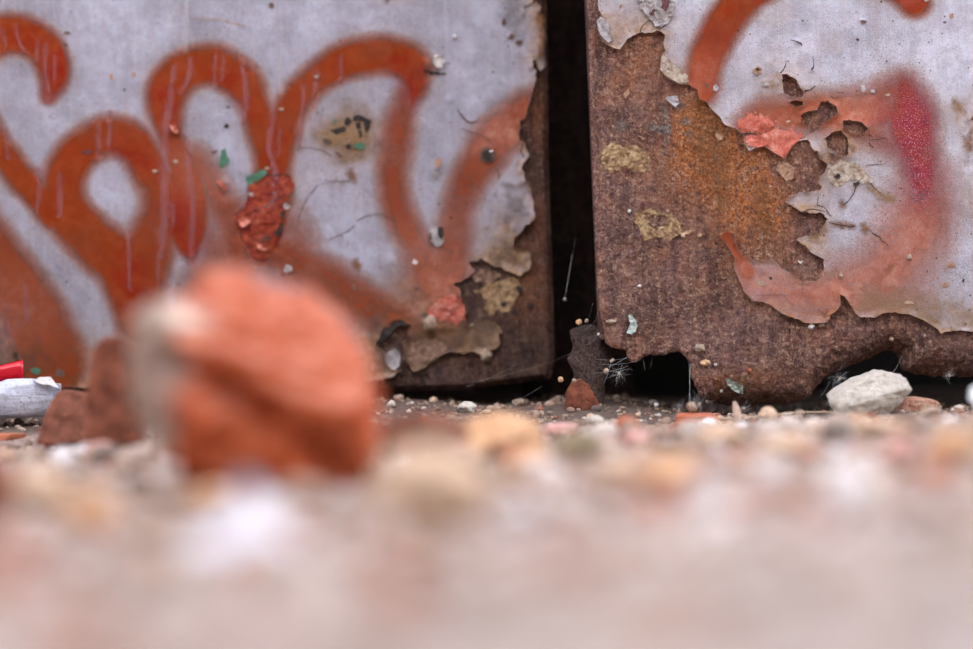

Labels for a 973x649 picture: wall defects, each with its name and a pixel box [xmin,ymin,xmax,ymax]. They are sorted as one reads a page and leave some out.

peeling [55,368,87,392]
peeling [374,0,554,392]
peeling [586,0,973,407]